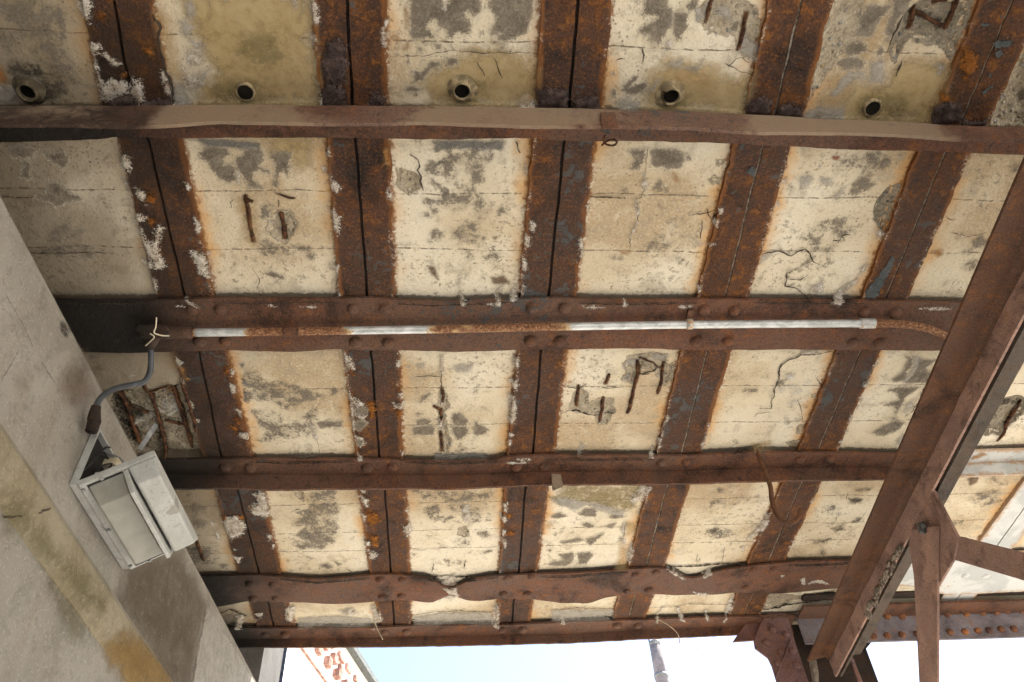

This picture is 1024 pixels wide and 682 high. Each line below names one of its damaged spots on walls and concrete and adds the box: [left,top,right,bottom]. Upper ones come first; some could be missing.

damp [74,0,94,25]
damp [88,42,145,105]
damp [806,59,945,120]
spalling [809,0,990,100]
peeling [198,139,299,244]
crack [410,154,424,191]
damp [190,250,211,279]
crack [758,249,864,305]
spalling [108,383,200,459]
spalling [569,352,676,425]
crack [754,351,840,420]
spalling [983,395,1024,442]